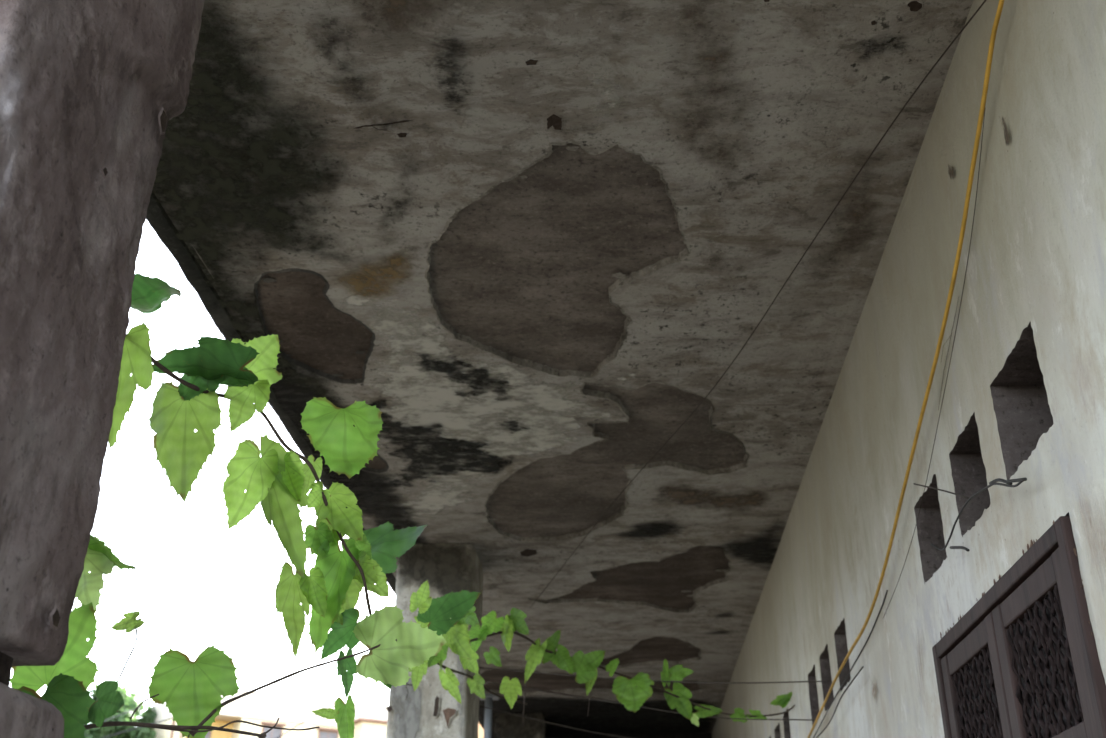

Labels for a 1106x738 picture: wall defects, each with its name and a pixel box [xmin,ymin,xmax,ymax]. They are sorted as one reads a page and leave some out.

mould [435,39,469,111]
water stain [151,3,339,344]
flaking render [253,268,375,384]
flaking render [425,112,750,557]
water stain [270,256,611,595]
flaking render [362,453,389,473]
flaking render [527,545,732,613]
water stain [622,523,681,538]
water stain [660,486,766,510]
water stain [718,525,781,568]